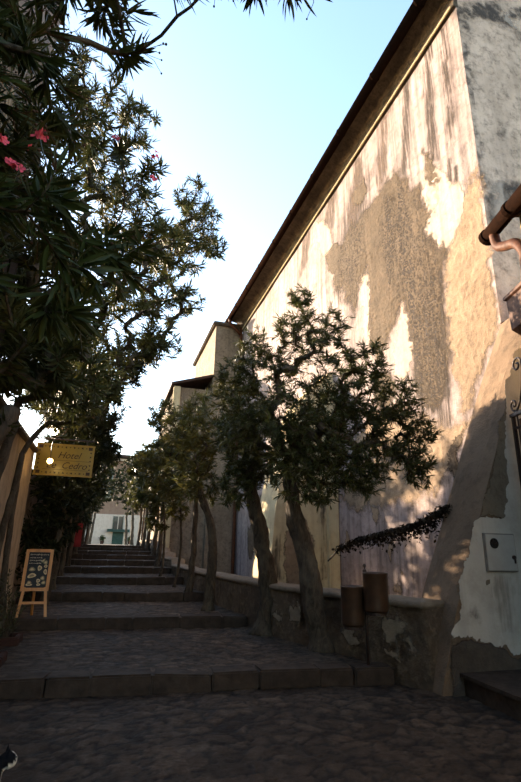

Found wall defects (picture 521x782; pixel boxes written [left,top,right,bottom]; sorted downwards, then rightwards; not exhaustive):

water stain [423,28,455,158]
water stain [299,227,311,275]
water stain [338,111,388,300]
water stain [382,80,450,426]